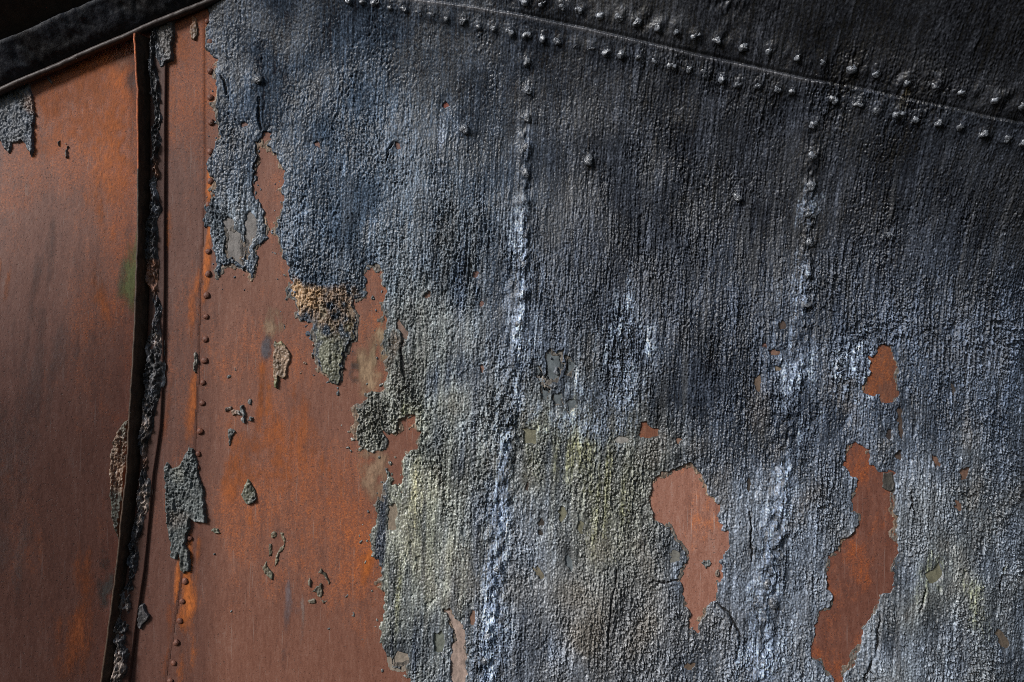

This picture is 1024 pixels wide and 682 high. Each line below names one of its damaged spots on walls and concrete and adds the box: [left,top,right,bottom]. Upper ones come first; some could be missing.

corrosion [110,27,166,682]
corrosion [195,226,210,291]
peeling [164,50,421,682]
corrosion [291,281,356,384]
corrosion [175,568,195,619]
peeling [649,465,730,633]
peeling [811,345,903,682]